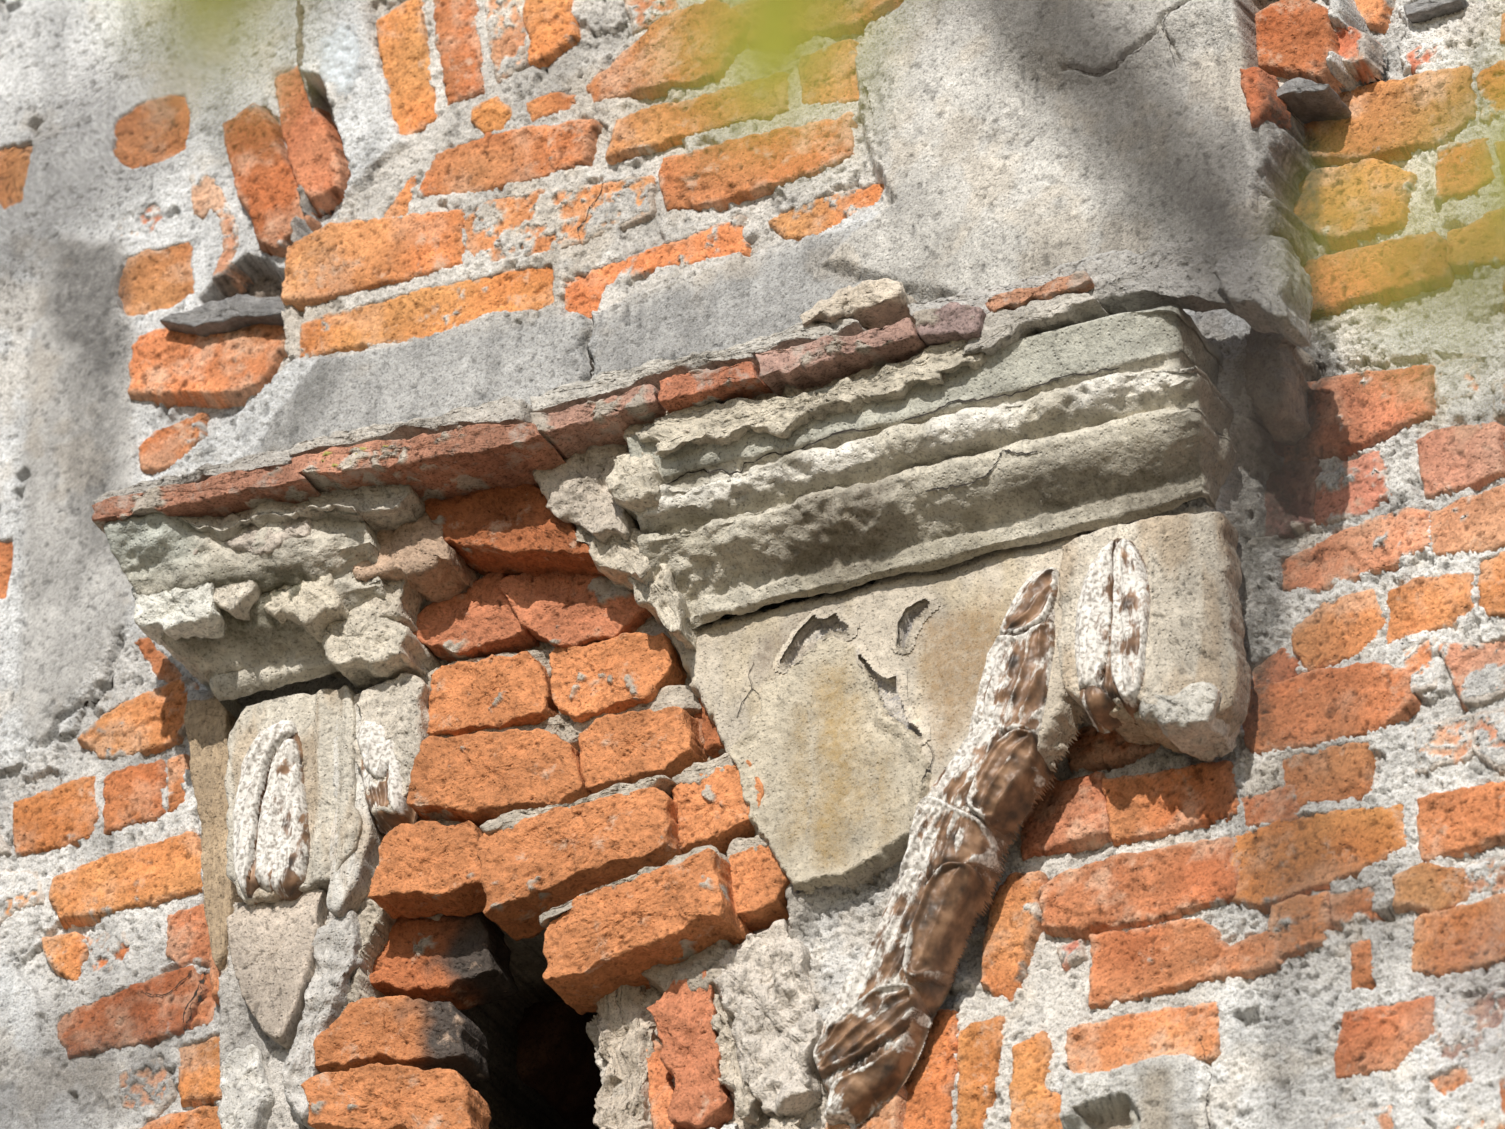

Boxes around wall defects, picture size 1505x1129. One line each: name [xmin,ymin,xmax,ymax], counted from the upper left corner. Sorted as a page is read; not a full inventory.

spalling [110,0,904,484]
crack [1147,6,1181,64]
spalling [1257,0,1505,341]
spalling [0,542,13,599]
spalling [0,630,220,1055]
spalling [301,484,1291,1129]
spalling [1283,427,1505,915]
spalling [1306,354,1505,498]
spalling [62,998,222,1129]
spalling [1328,907,1505,1129]